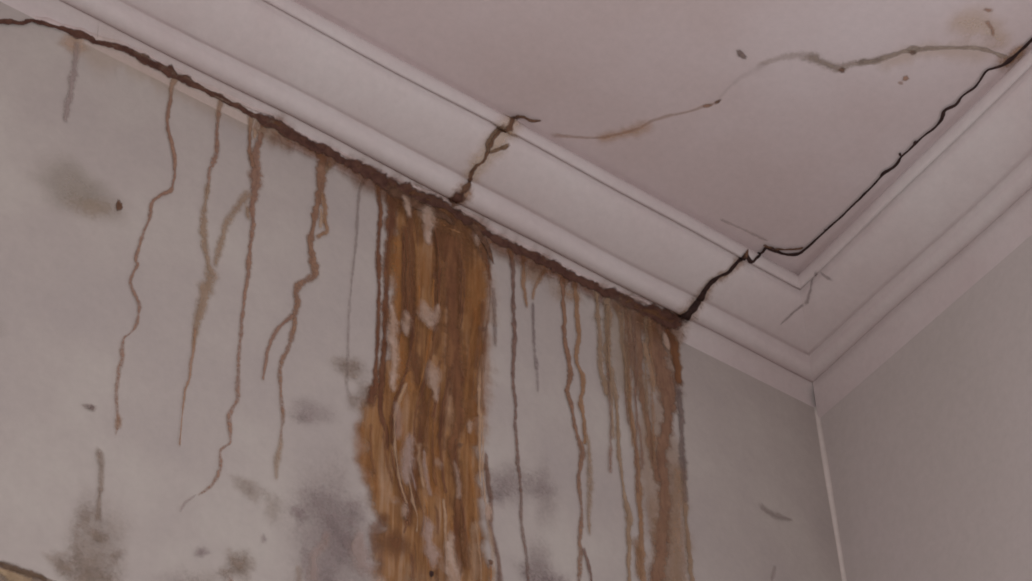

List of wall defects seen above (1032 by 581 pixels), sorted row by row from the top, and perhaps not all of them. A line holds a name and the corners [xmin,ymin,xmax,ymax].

crack [0,16,1032,337]